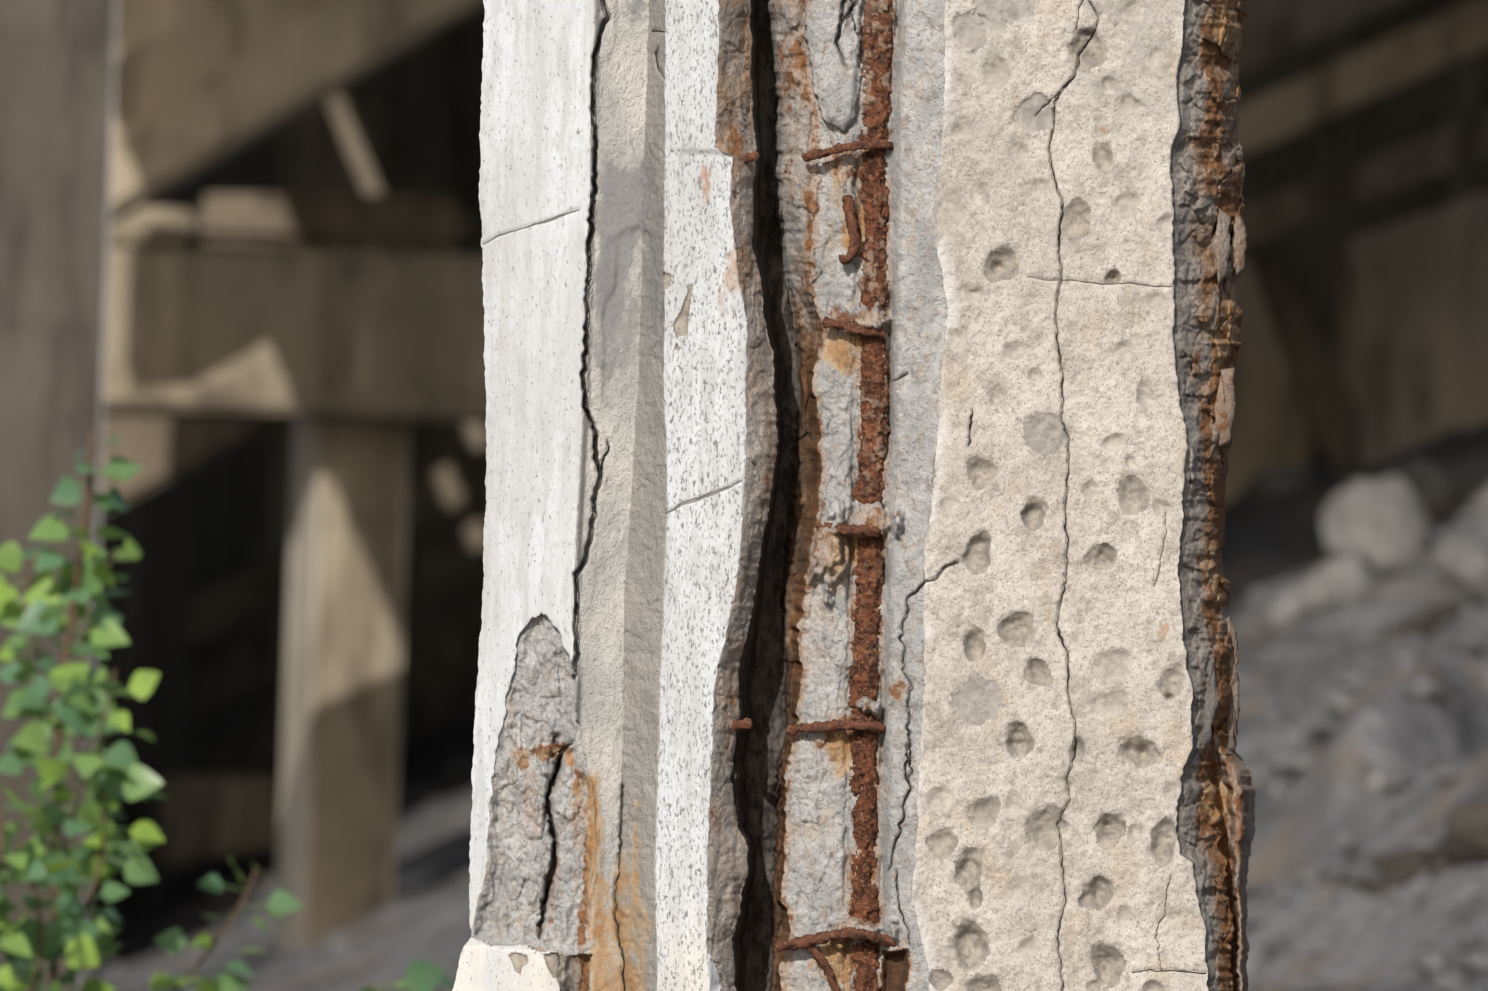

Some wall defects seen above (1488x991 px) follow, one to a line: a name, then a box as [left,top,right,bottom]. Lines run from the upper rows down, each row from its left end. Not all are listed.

crack [483,0,609,680]
crack [666,0,858,991]
corrosion [823,335,862,374]
corrosion [842,204,866,252]
spalling [779,0,1257,991]
crack [1027,0,1151,991]
spalling [471,614,596,991]
crack [538,741,572,935]
corrosion [544,748,647,991]
corrosion [813,941,850,991]
corrosion [827,730,851,777]
crack [888,561,959,945]